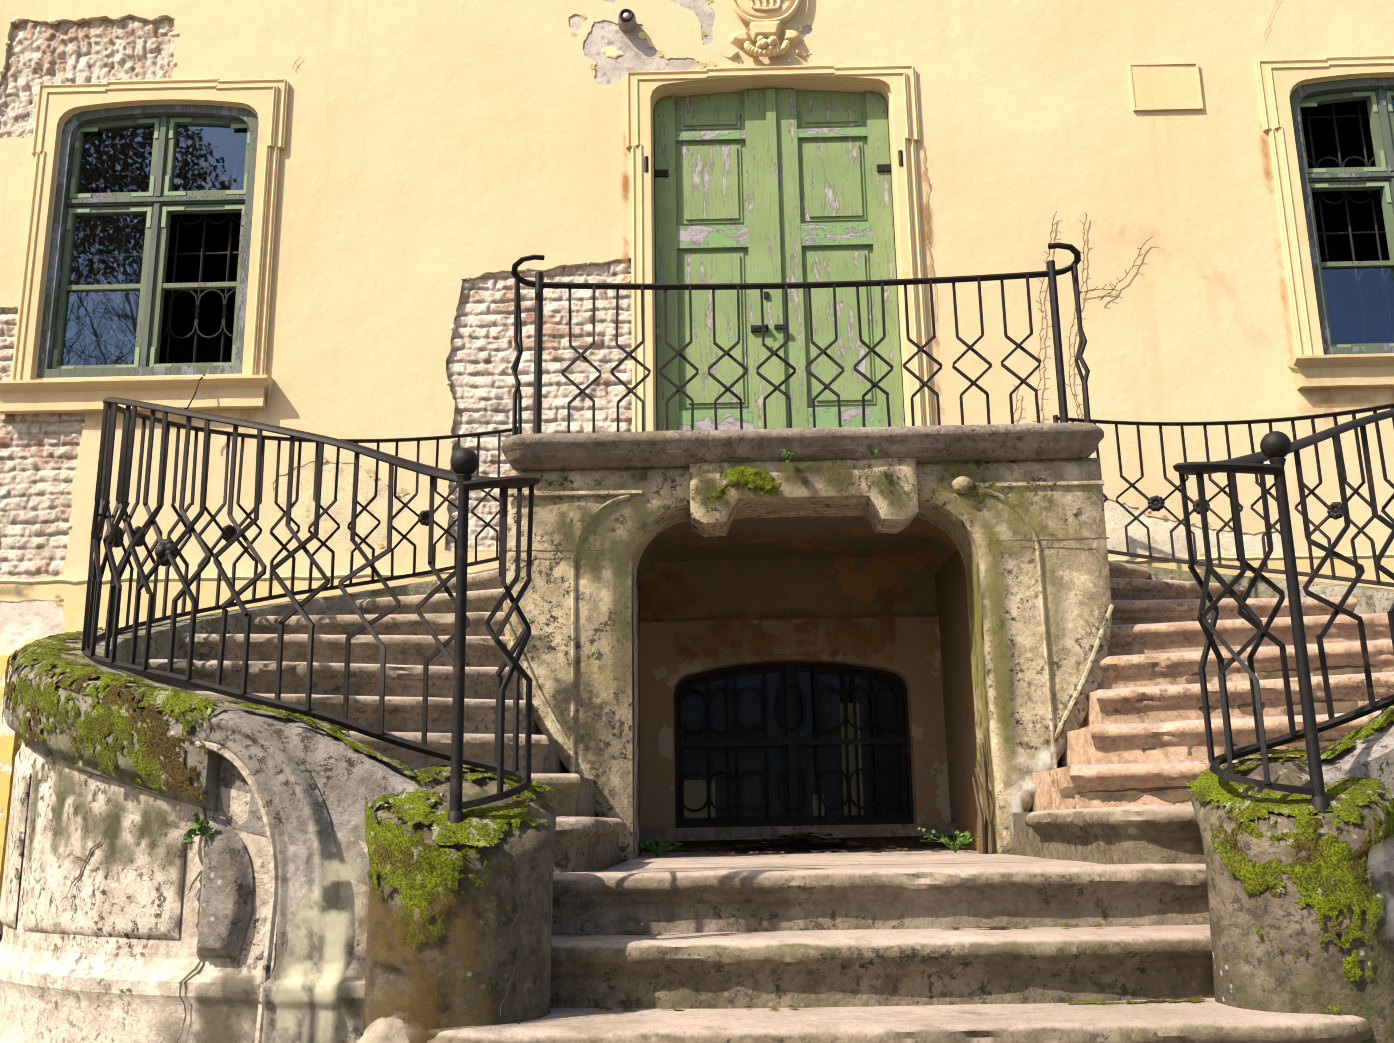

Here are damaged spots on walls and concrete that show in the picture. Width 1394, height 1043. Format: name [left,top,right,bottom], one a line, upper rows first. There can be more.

flaking render [0,15,180,138]
flaking render [569,0,716,85]
flaking render [0,305,18,380]
flaking render [445,259,632,551]
flaking render [0,413,88,579]
flaking render [0,594,65,654]